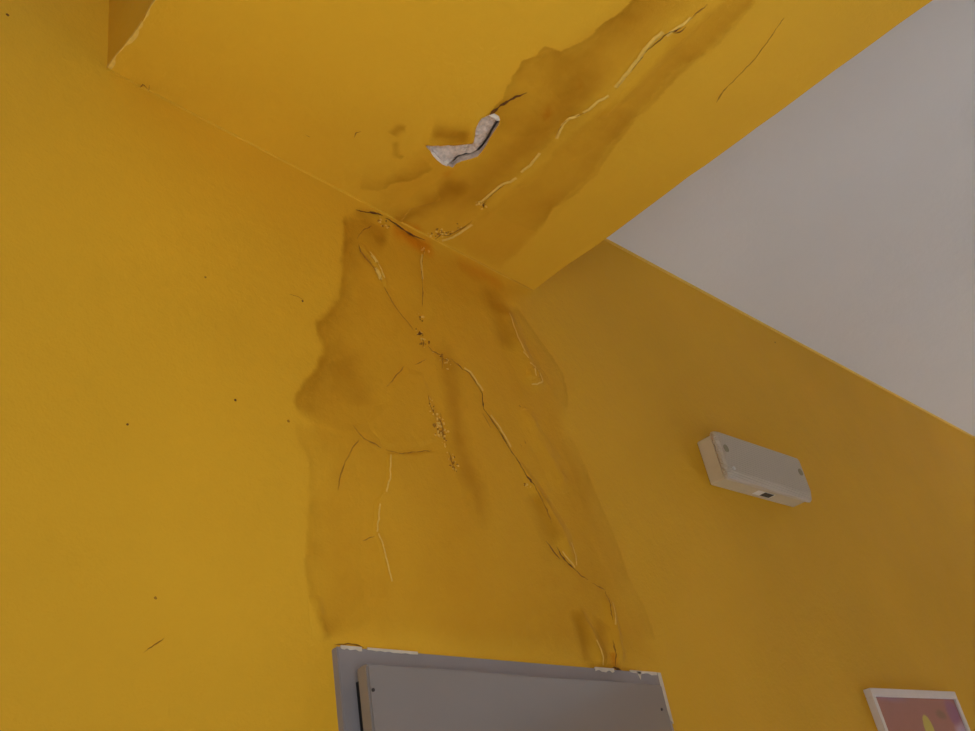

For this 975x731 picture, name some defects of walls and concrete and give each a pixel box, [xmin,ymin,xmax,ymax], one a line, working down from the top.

spalling [426,93,526,168]
crack [357,6,706,671]
crack [338,396,459,487]